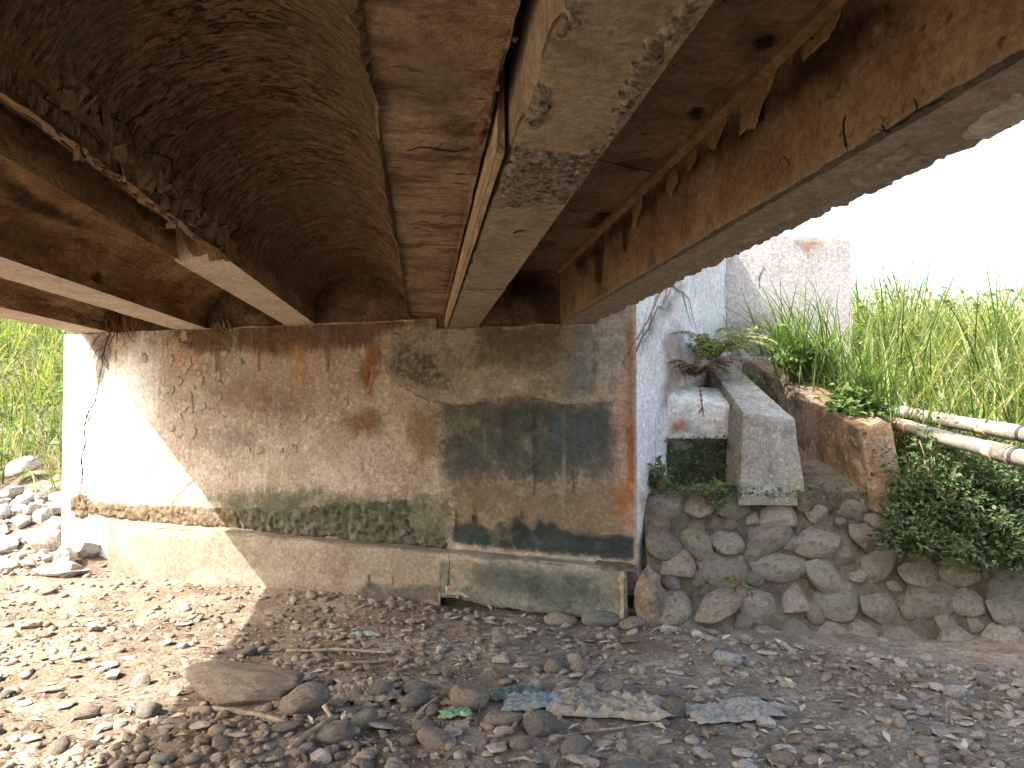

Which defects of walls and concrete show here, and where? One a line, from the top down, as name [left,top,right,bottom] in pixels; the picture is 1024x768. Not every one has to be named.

crack [23,69,243,250]
crack [407,144,469,153]
spalling [499,0,704,209]
damp [393,345,449,389]
crack [79,387,98,498]
damp [413,378,644,561]
corrosion [620,428,633,502]